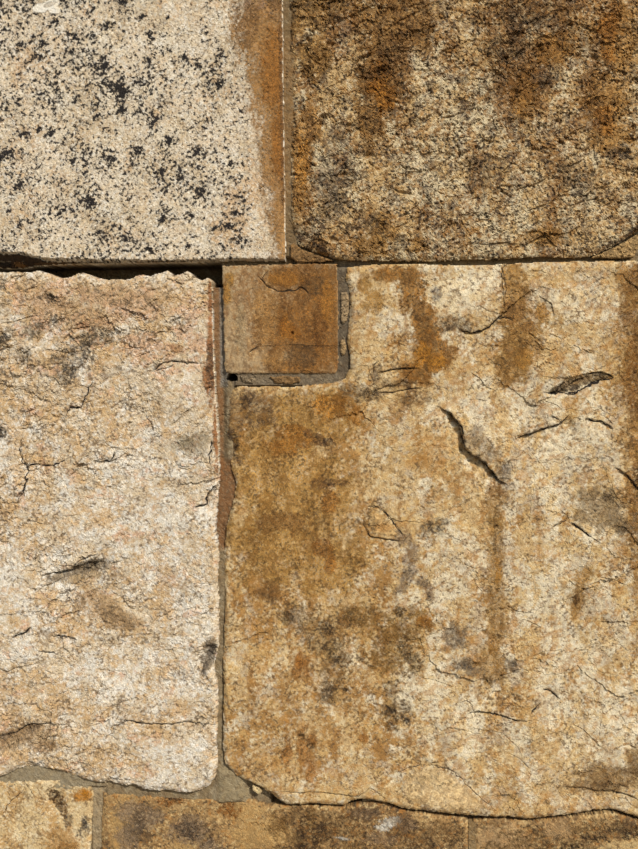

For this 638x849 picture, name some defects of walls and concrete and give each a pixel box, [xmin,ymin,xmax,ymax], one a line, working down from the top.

crack [462,315,512,334]
crack [546,372,614,395]
crack [516,416,613,439]
crack [438,406,509,483]